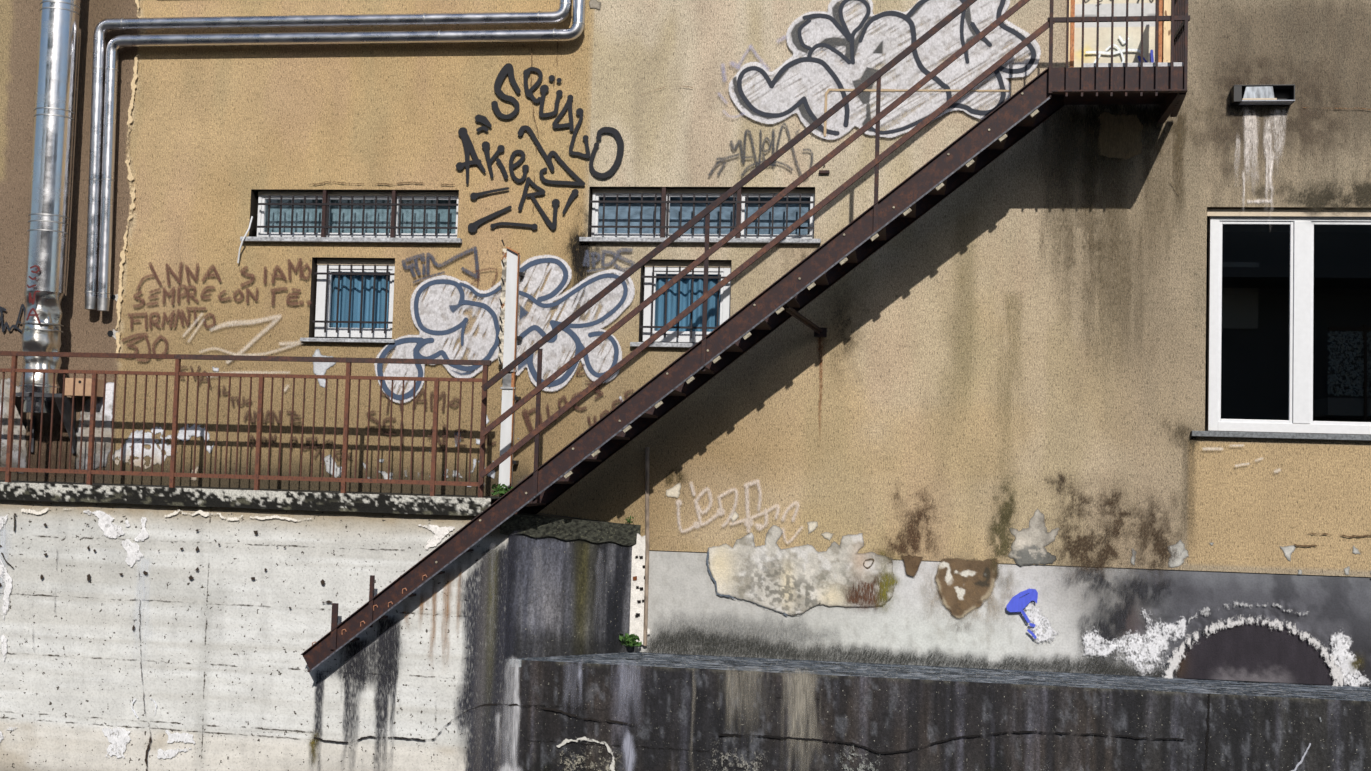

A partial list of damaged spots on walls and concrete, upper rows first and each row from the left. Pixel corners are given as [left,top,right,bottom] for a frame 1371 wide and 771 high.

water stain [1057,104,1186,268]
water stain [1243,110,1371,211]
spalling [708,521,895,616]
water stain [888,496,932,567]
water stain [991,487,1014,566]
peeling [1008,509,1060,566]
water stain [1051,474,1369,687]
peeling [1279,545,1302,574]
water stain [312,618,399,766]
water stain [457,535,520,771]
crack [719,731,1186,754]
crack [1291,743,1311,771]